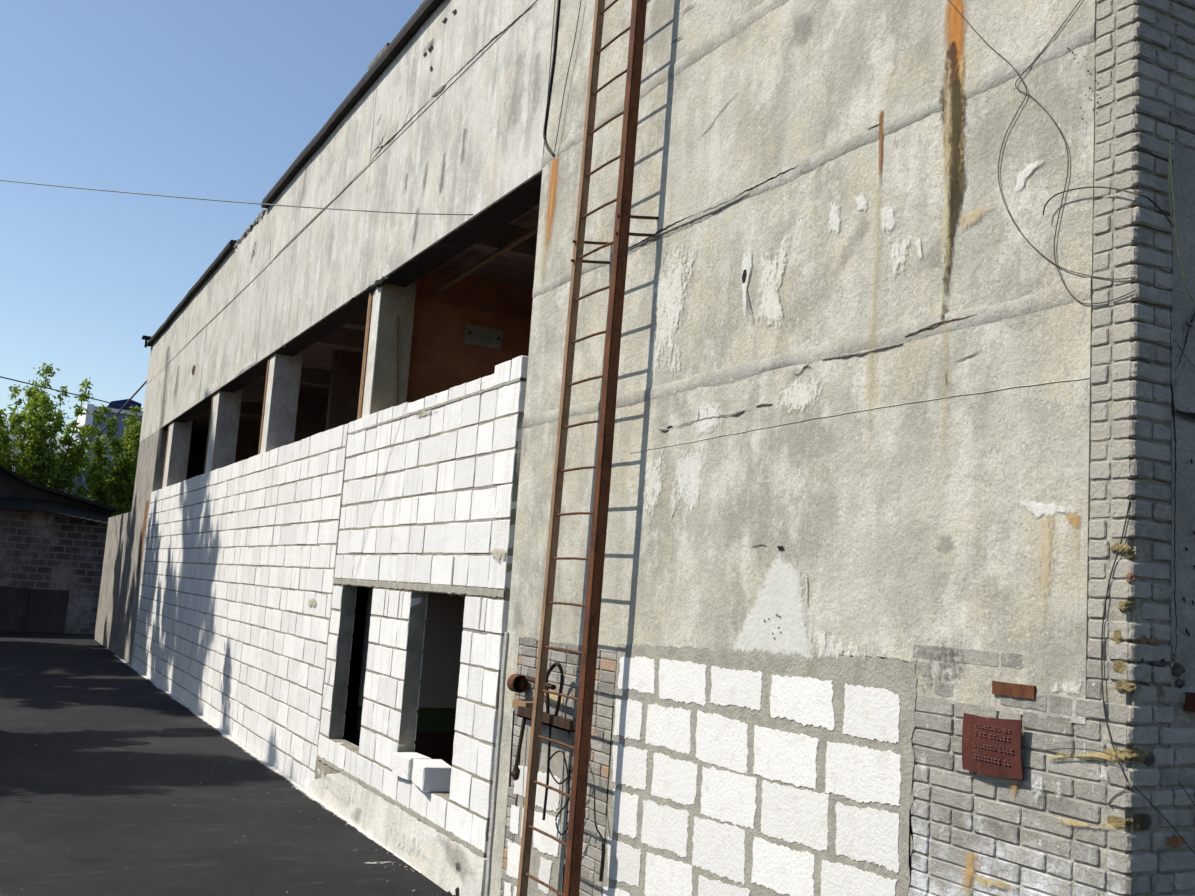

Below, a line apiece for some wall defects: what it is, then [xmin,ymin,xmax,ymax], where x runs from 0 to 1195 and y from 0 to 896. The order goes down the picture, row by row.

rust [940,0,966,319]
rust [546,158,558,243]
crack [628,165,798,250]
peeling [829,202,840,234]
peeling [855,193,867,211]
peeling [881,205,922,277]
peeling [742,237,789,326]
crack [904,315,974,338]
crack [658,403,772,432]
rust [964,852,1012,891]